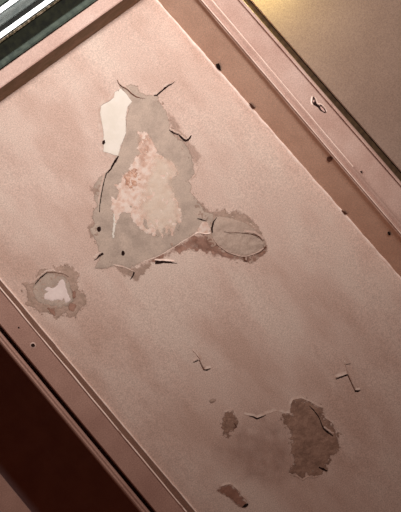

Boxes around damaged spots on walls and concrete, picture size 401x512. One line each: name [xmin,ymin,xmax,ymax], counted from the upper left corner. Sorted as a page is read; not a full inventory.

crack [153,80,174,96]
crack [169,128,192,142]
peeling [88,79,213,281]
peeling [21,264,86,319]
peeling [220,408,240,438]
crack [244,409,285,419]
peeling [281,396,342,481]
peeling [218,482,249,508]